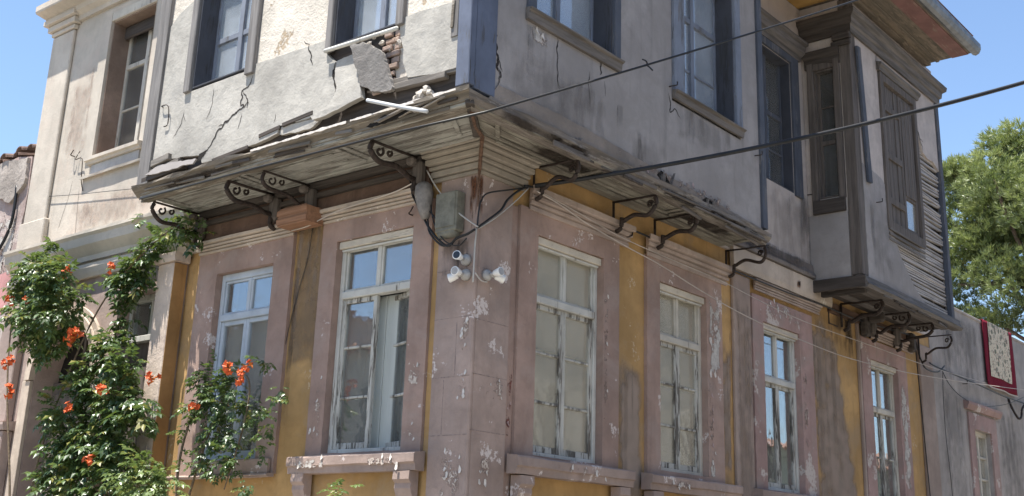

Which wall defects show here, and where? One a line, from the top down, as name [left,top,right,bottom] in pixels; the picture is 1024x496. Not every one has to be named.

crack [172,76,253,163]
crack [304,41,336,96]
flaking render [212,30,456,161]
crack [495,45,503,85]
peeling [709,300,721,378]
leakage [813,323,857,496]